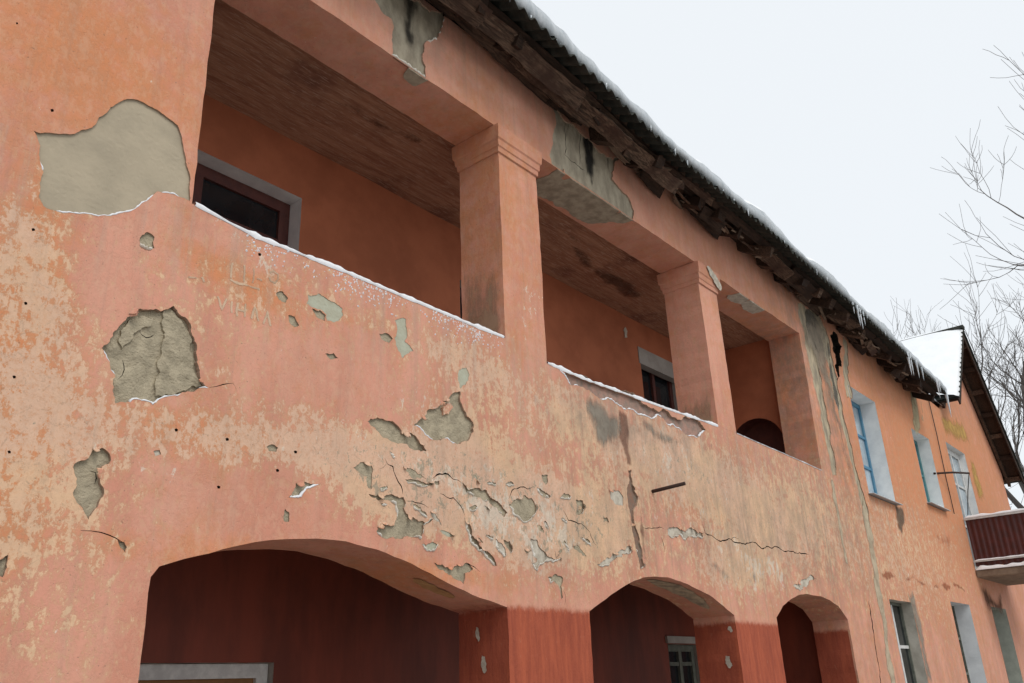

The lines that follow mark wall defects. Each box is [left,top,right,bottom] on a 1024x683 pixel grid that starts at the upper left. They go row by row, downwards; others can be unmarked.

spalling [375,0,444,86]
spalling [34,99,191,216]
spalling [536,109,634,224]
spalling [73,447,111,519]
spalling [102,306,208,405]
spalling [368,368,474,487]
peeling [354,460,591,599]
peeling [597,470,709,609]
crack [704,530,806,554]
leakage [803,309,841,430]
spalling [798,302,870,525]
leakage [862,500,895,683]